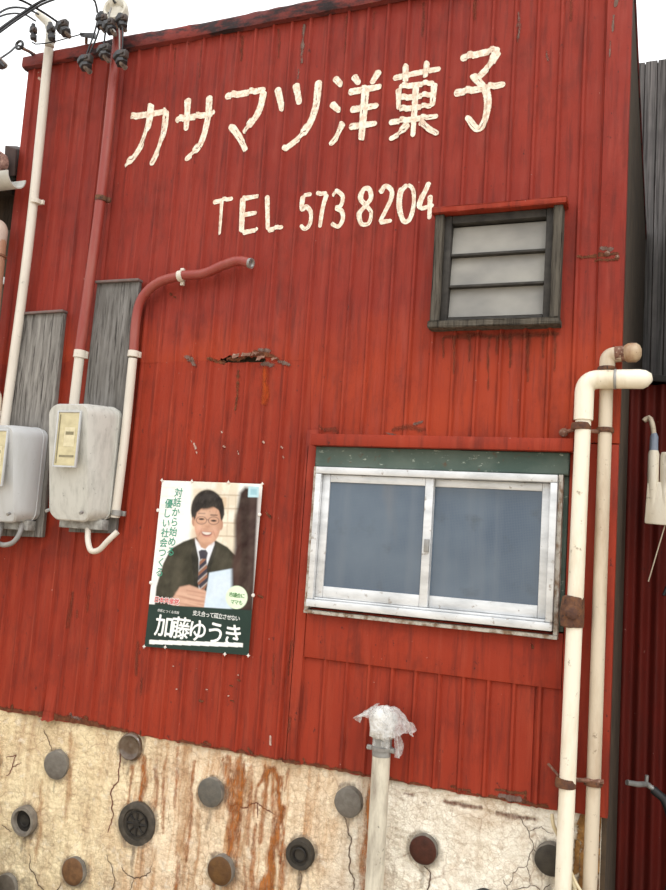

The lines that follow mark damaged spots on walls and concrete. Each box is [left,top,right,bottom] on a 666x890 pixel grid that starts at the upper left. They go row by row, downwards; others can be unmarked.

peeling [232,352,290,367]
crack [107,754,121,833]
corrosion [128,756,178,811]
corrosion [174,739,371,890]
corrosion [389,776,549,809]
crack [107,856,151,890]
crack [344,817,355,890]
crack [503,817,550,890]